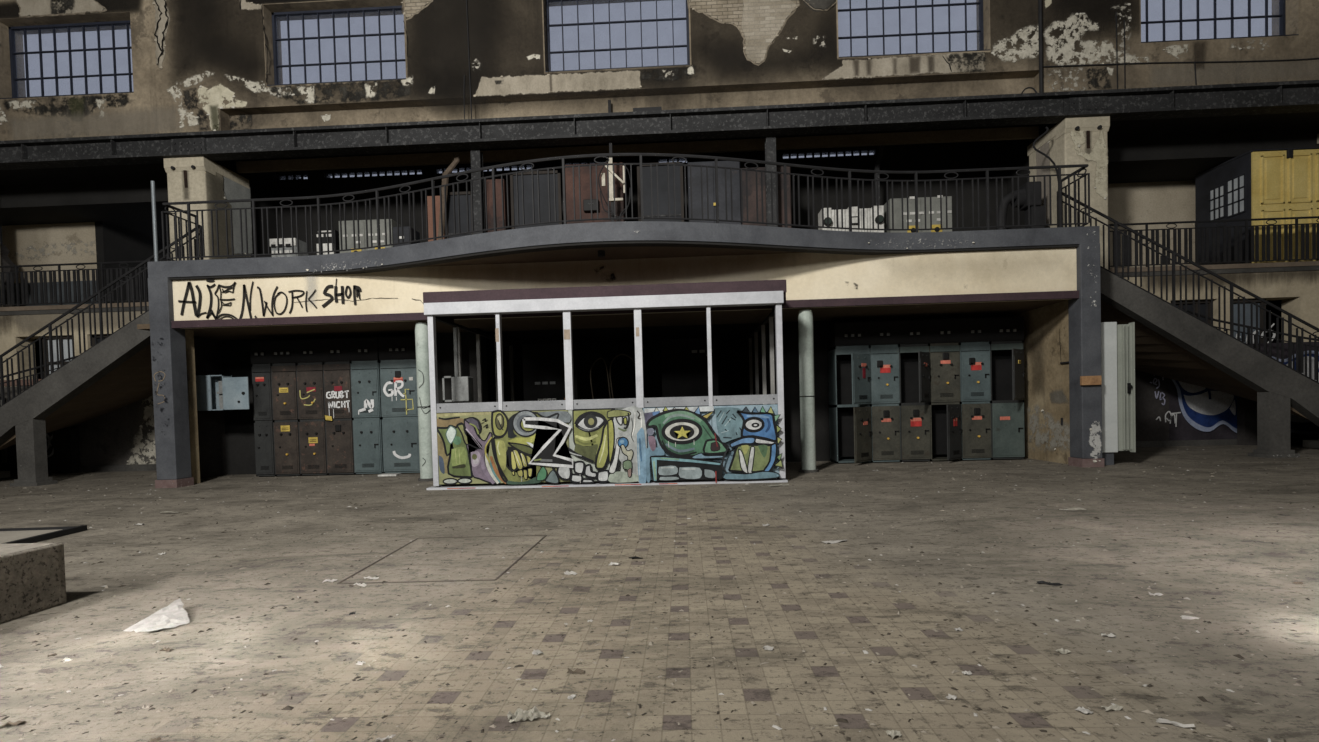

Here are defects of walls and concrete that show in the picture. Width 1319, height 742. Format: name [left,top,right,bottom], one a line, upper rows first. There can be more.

peeling [167,71,295,131]
spalling [401,0,433,20]
spalling [472,54,642,97]
spalling [687,0,800,66]
spalling [822,3,1149,91]
peeling [1163,44,1188,59]